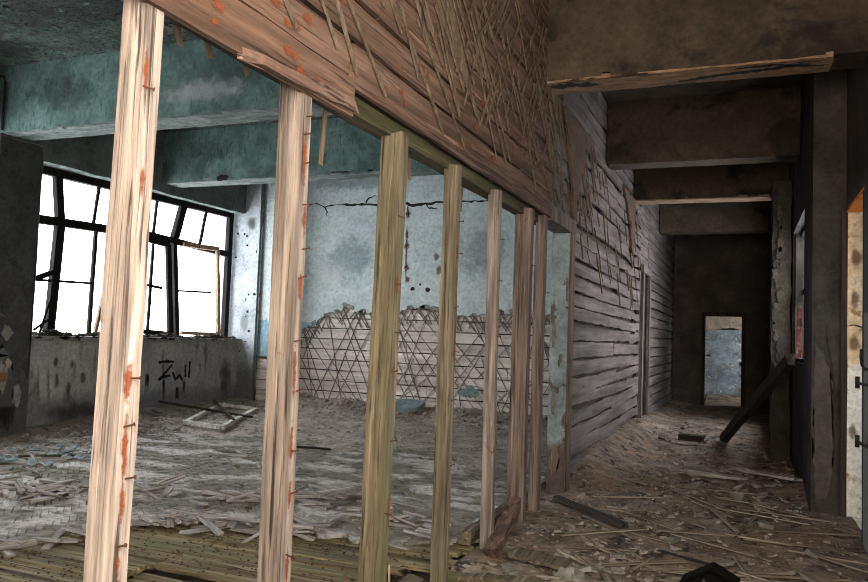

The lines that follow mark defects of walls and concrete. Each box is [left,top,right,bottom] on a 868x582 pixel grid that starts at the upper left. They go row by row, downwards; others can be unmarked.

crack [310,195,377,216]
crack [406,200,488,216]
corrosion [124,364,132,399]
spalling [299,302,372,402]
spalling [396,305,439,407]
spalling [454,313,486,410]
spalling [497,309,512,412]
peeling [543,314,564,483]